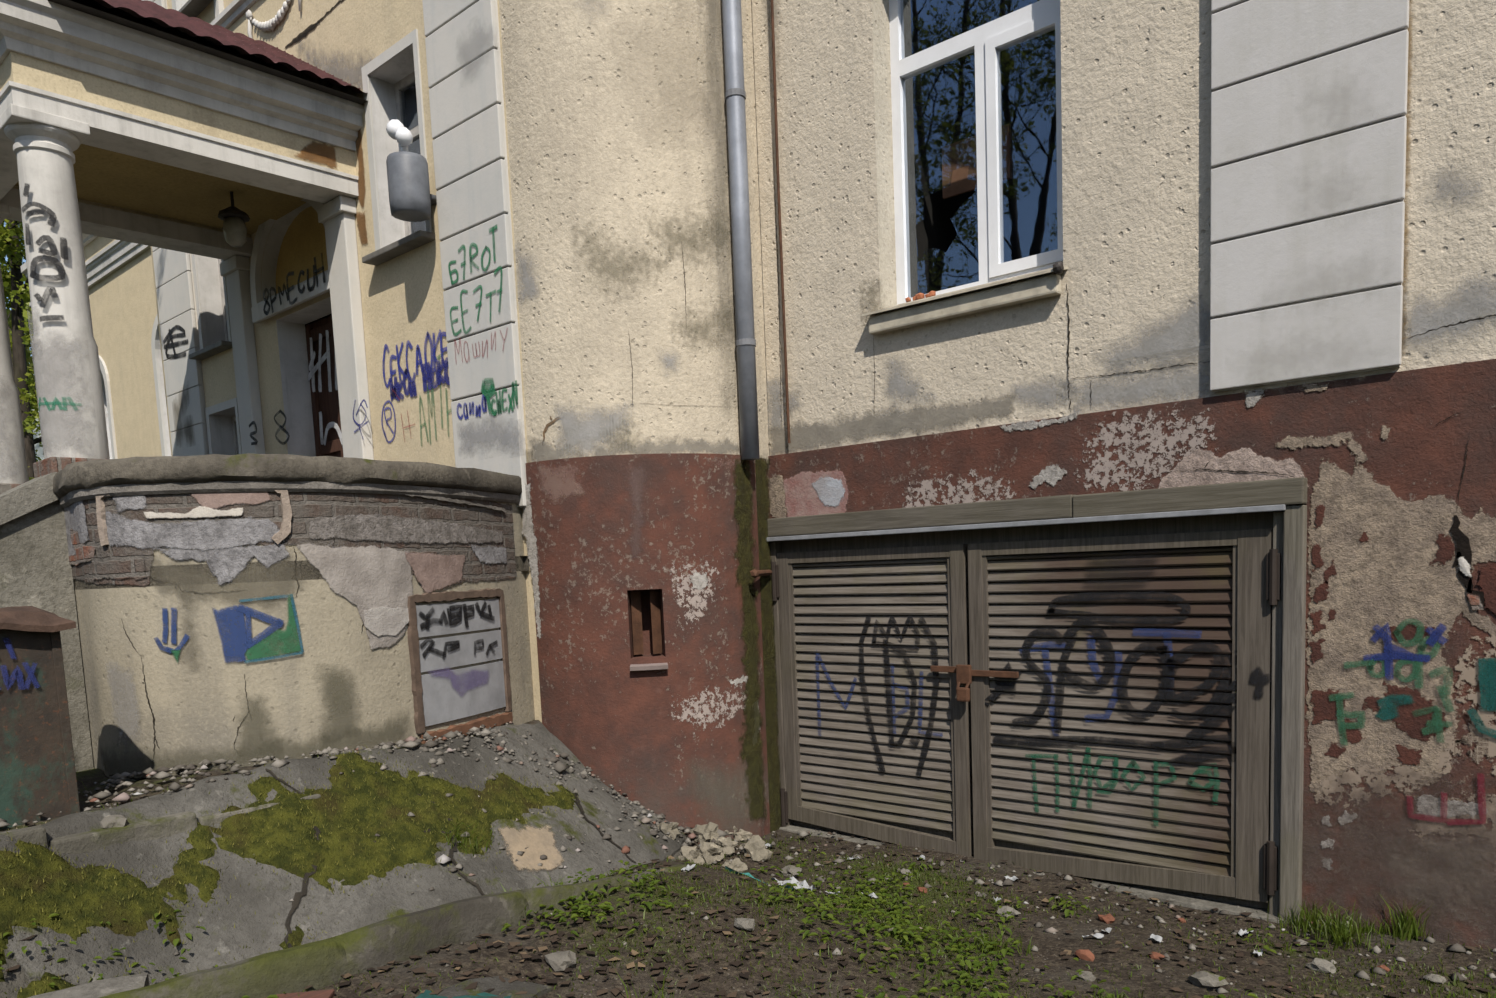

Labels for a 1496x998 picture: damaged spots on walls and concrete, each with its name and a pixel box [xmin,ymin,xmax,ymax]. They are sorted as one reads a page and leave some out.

flaking render [64,464,584,650]
damp [461,411,739,556]
peeling [769,470,850,518]
damp [755,303,1210,833]
peeling [902,401,1496,870]
crack [1433,411,1484,610]
crack [418,794,484,896]
crack [574,788,636,863]